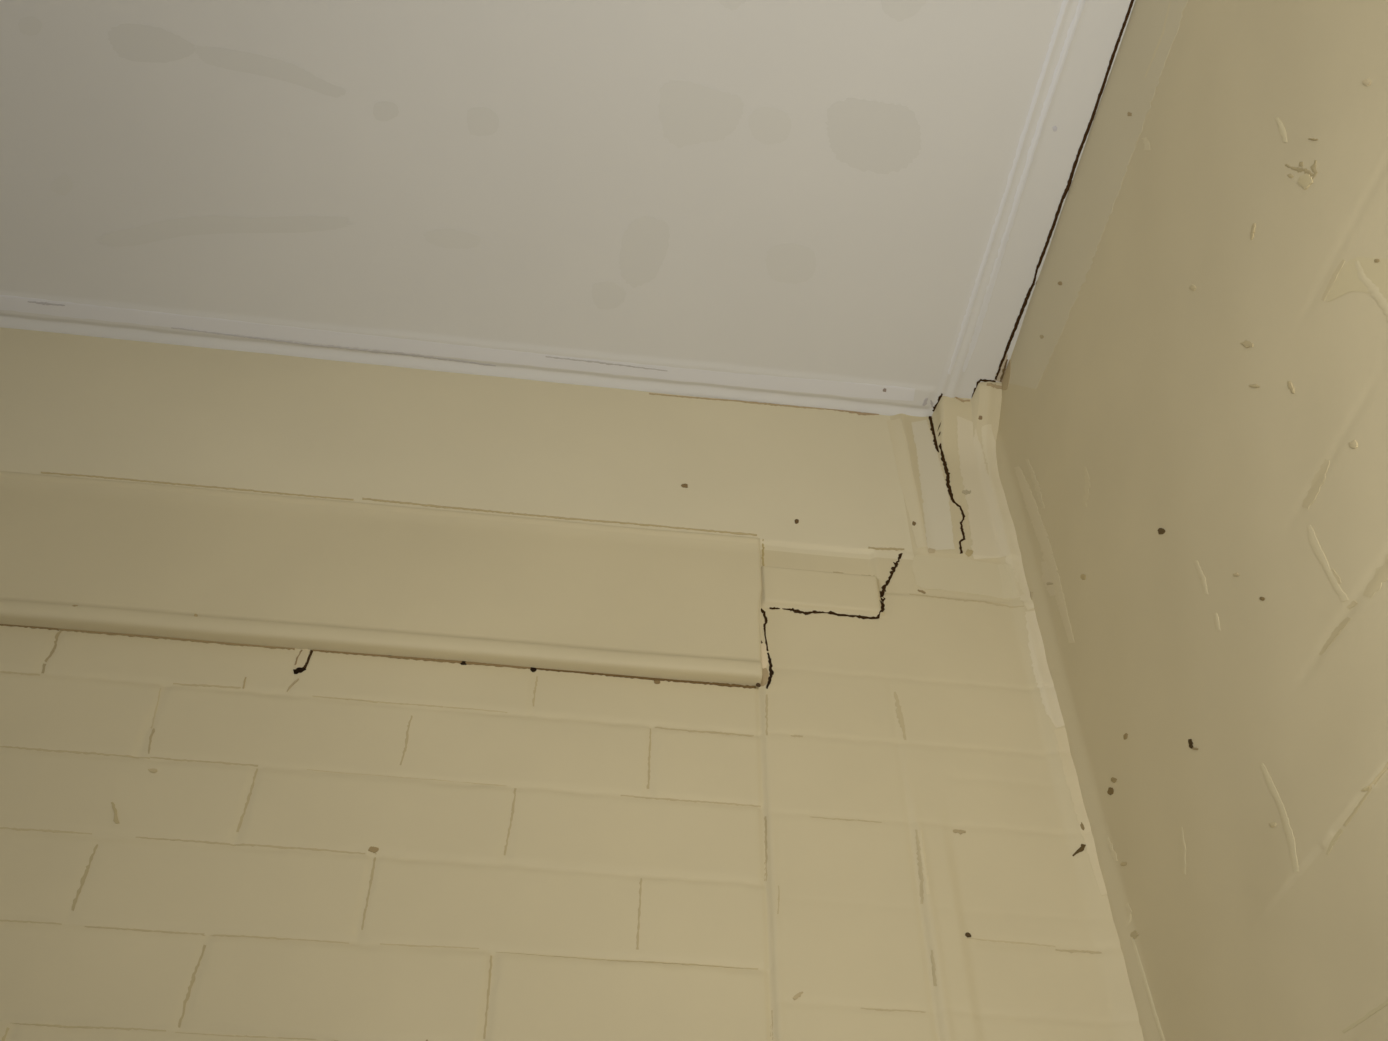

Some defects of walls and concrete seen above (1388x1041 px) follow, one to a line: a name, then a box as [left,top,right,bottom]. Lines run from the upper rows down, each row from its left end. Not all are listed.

crack [41,472,765,566]
crack [929,0,1134,554]
crack [0,546,1024,1041]